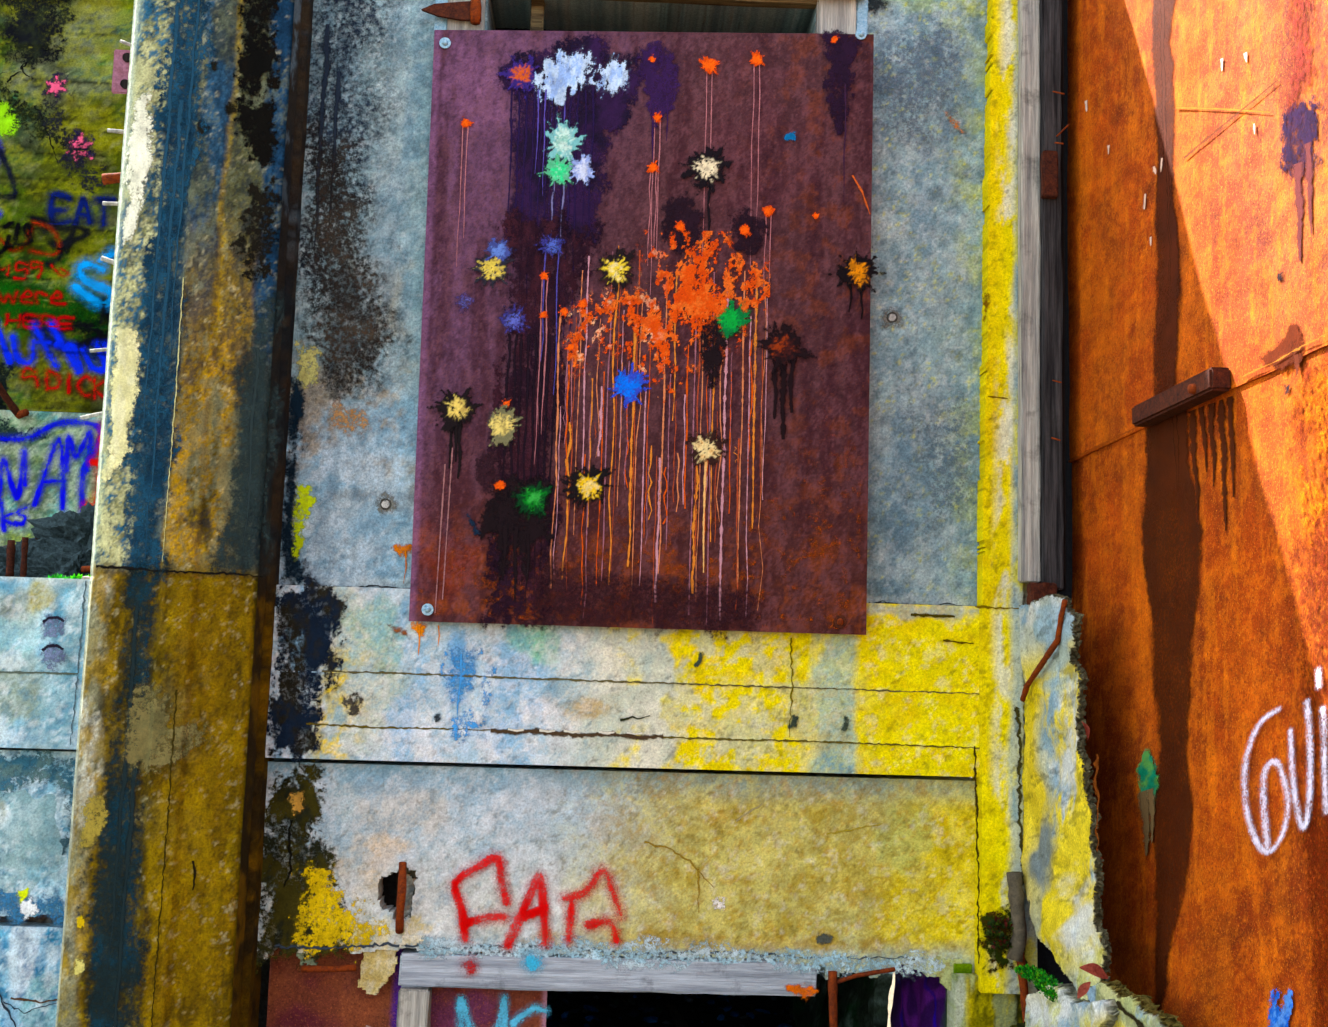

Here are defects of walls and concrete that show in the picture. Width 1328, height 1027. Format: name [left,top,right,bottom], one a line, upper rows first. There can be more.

corrosion [1279,0,1324,262]
damp [0,0,218,1027]
damp [209,0,410,976]
corrosion [266,948,405,1027]
corrosion [430,987,547,1027]
corrosion [1262,324,1328,1027]